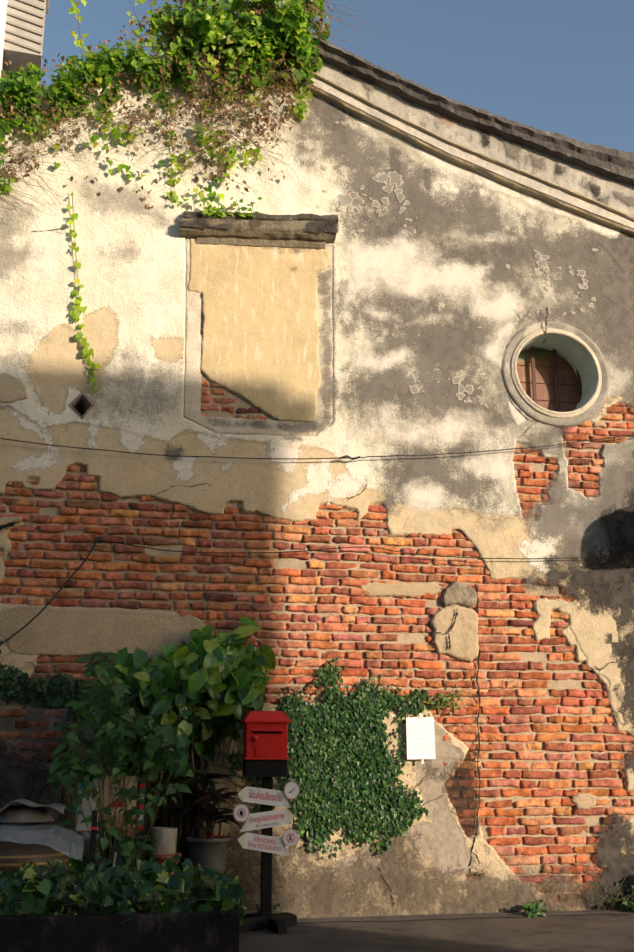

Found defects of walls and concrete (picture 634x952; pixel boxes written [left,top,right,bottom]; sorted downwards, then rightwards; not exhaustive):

water stain [180,93,634,524]
water stain [165,445,183,461]
spalling [0,307,634,908]
crack [436,583,479,650]
water stain [523,454,634,773]
water stain [224,812,634,918]
crack [468,640,481,873]